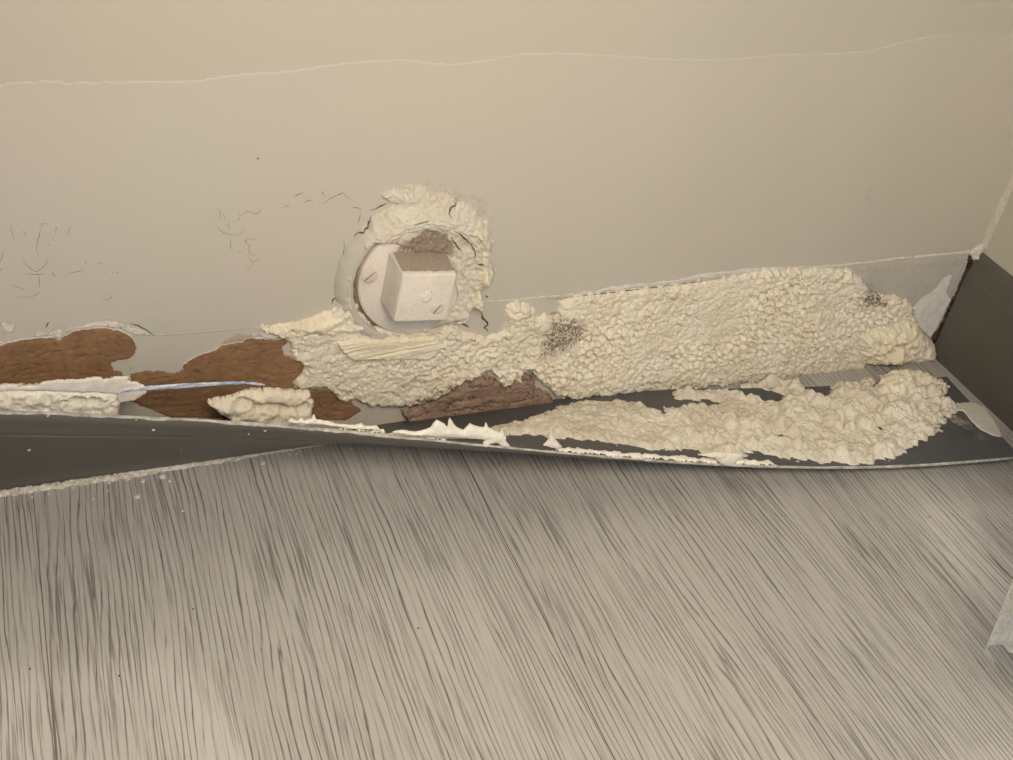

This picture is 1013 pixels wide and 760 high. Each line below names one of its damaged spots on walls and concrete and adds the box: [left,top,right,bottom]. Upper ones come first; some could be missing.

crack [0,223,118,301]
crack [218,191,386,270]